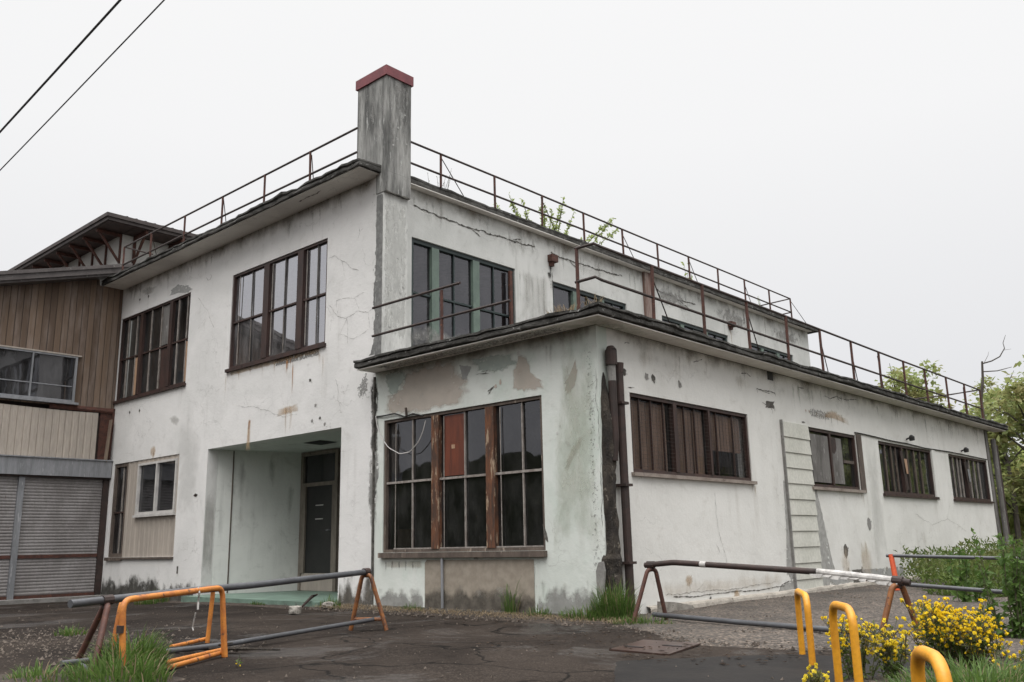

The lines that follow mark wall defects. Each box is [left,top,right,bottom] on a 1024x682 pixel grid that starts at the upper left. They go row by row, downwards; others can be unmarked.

crack [385,182,622,276]
peeling [358,351,541,413]
peeling [565,345,600,564]
water stain [100,576,193,601]